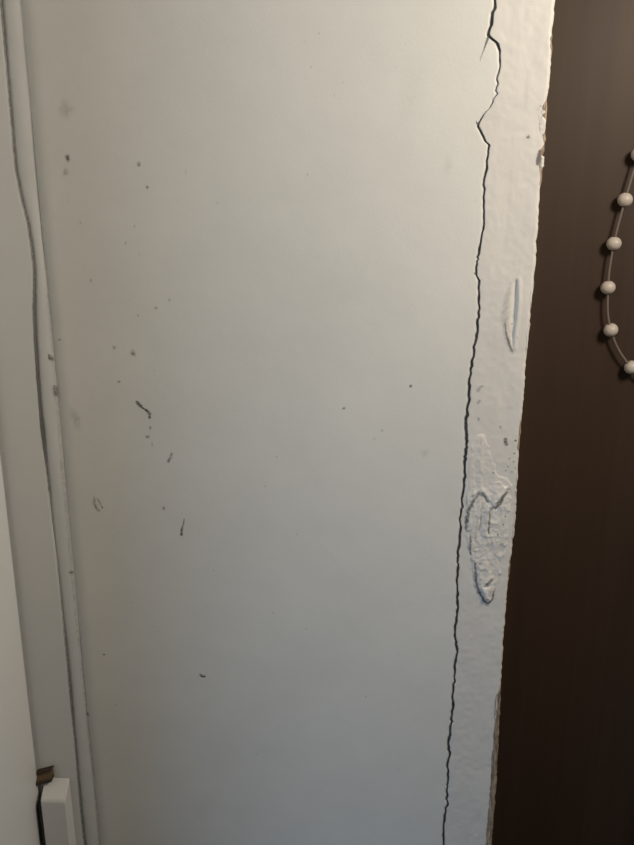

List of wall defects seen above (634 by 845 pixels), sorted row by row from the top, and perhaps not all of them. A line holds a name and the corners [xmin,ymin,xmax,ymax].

crack [484,0,501,94]
crack [442,118,490,845]
peeling [464,434,518,606]